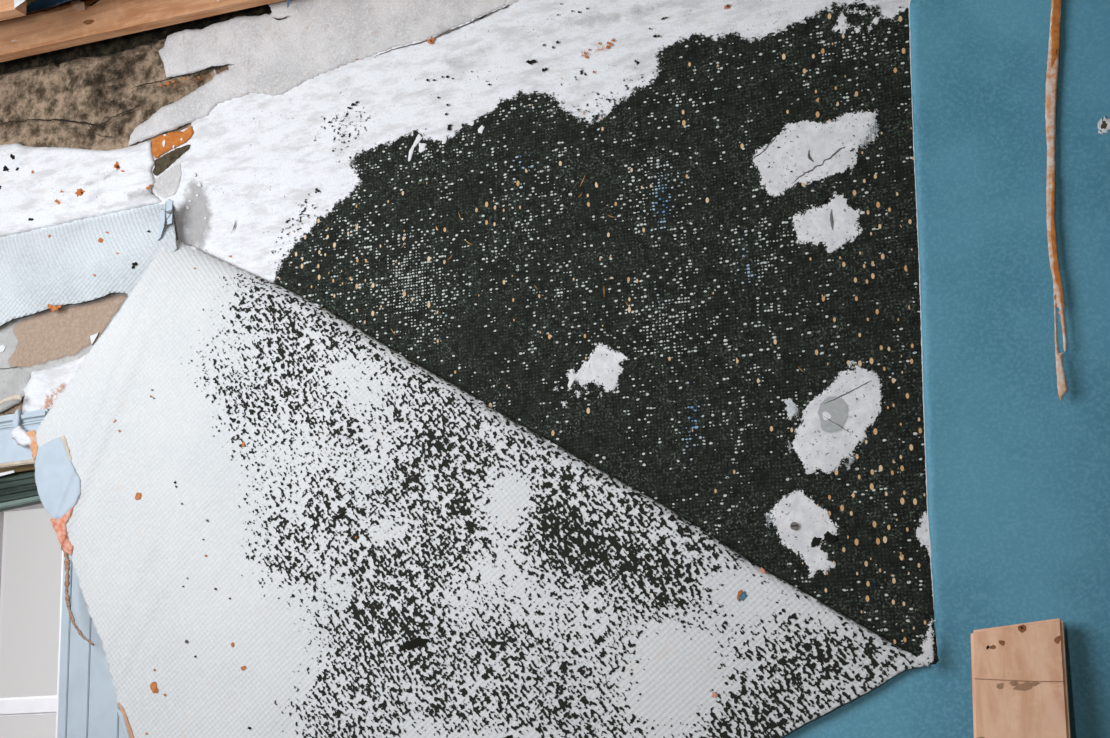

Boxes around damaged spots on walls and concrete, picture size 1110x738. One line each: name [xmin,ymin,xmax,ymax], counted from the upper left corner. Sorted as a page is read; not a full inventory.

crack [376,5,509,56]
peeling [11,332,99,448]
peeling [554,342,627,408]
peeling [784,361,885,474]
peeling [766,488,839,578]
peeling [916,511,932,559]